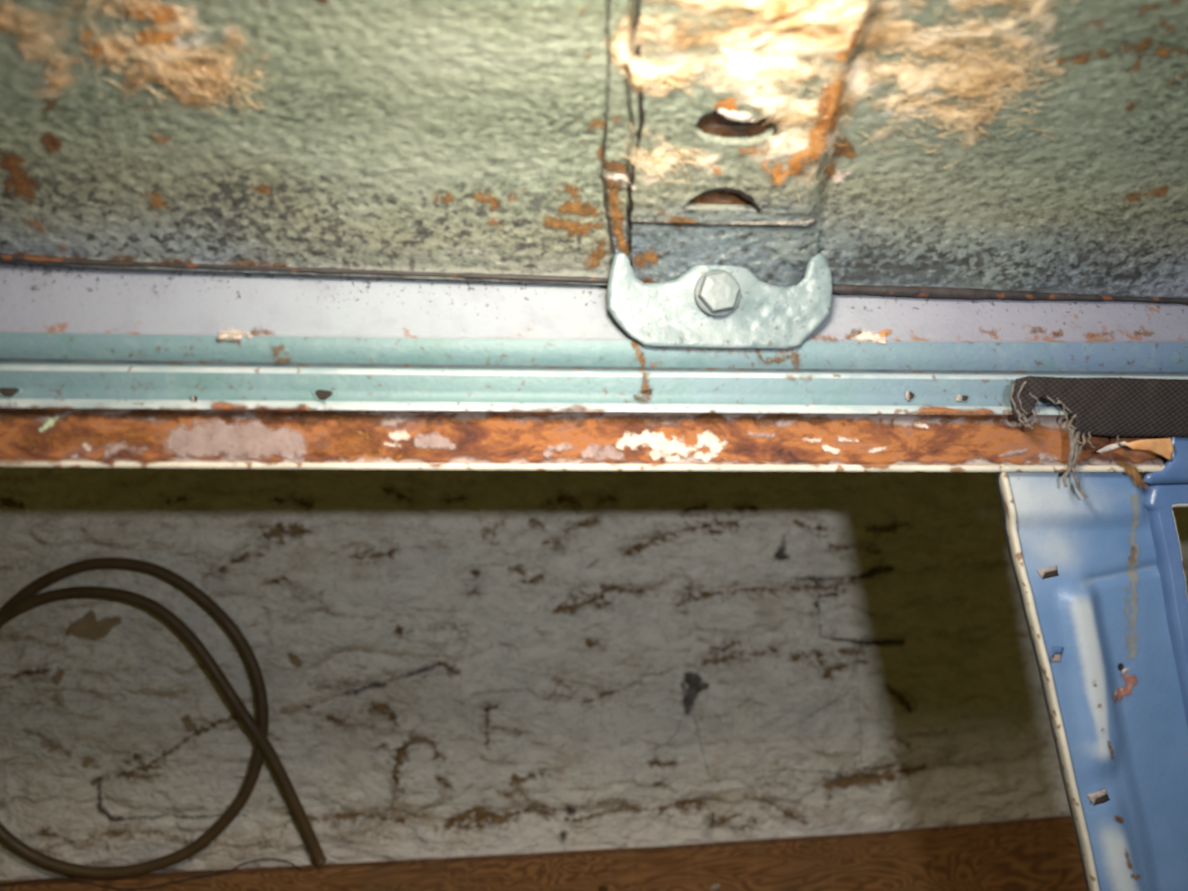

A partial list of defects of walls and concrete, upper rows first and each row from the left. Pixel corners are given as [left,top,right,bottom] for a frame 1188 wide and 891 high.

peeling [718,109,755,122]
rust [696,20,866,184]
crack [599,0,814,267]
peeling [634,147,717,176]
peeling [604,174,636,191]
peeling [83,443,148,458]
peeling [166,419,306,462]
peeling [384,431,455,450]
peeling [543,430,726,463]
peeling [805,437,885,454]
peeling [1097,438,1174,460]
rust [1098,674,1137,707]